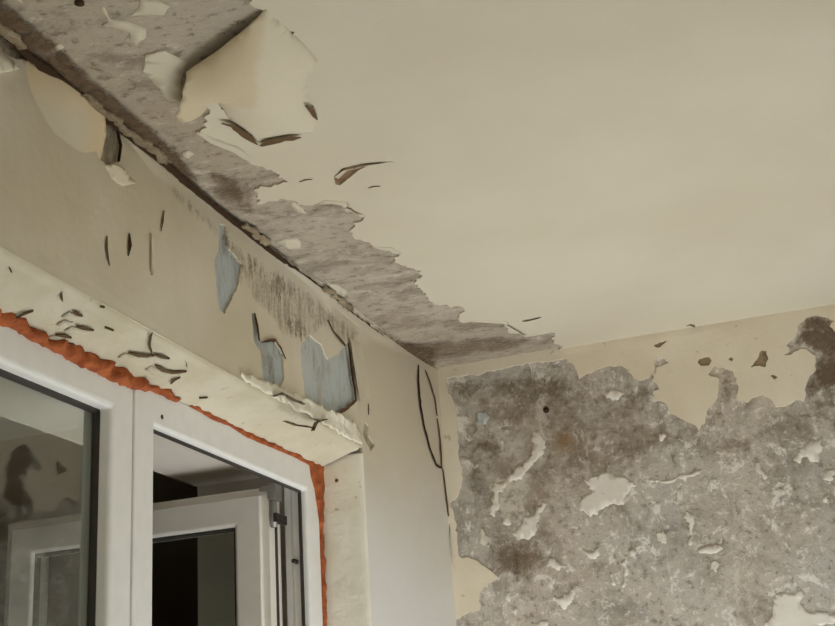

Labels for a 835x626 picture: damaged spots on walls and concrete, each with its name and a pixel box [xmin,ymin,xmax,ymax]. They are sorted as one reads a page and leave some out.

peeling [0,0,564,368]
peeling [446,316,835,626]
leakage [796,317,835,419]